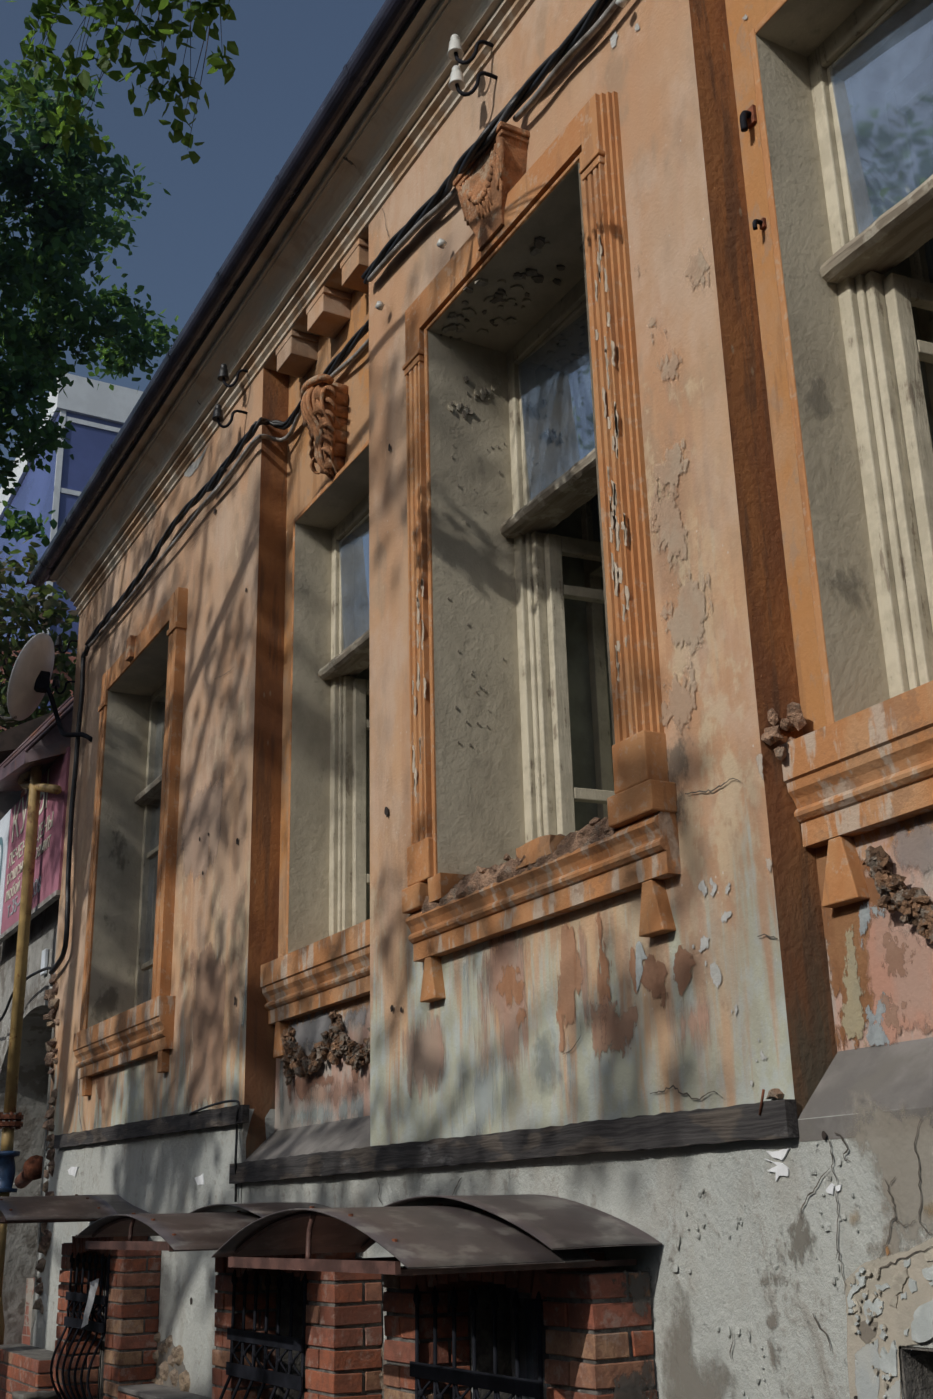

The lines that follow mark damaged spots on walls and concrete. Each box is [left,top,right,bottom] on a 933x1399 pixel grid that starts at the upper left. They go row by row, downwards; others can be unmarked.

peeling [440,236,565,342]
peeling [580,231,630,682]
crack [685,778,739,794]
peeling [635,941,647,991]
peeling [692,935,722,988]
peeling [841,901,890,1048]
crack [650,1085,723,1100]
crack [800,1118,933,1297]
damp [611,1311,728,1399]
flaking render [844,1237,933,1399]